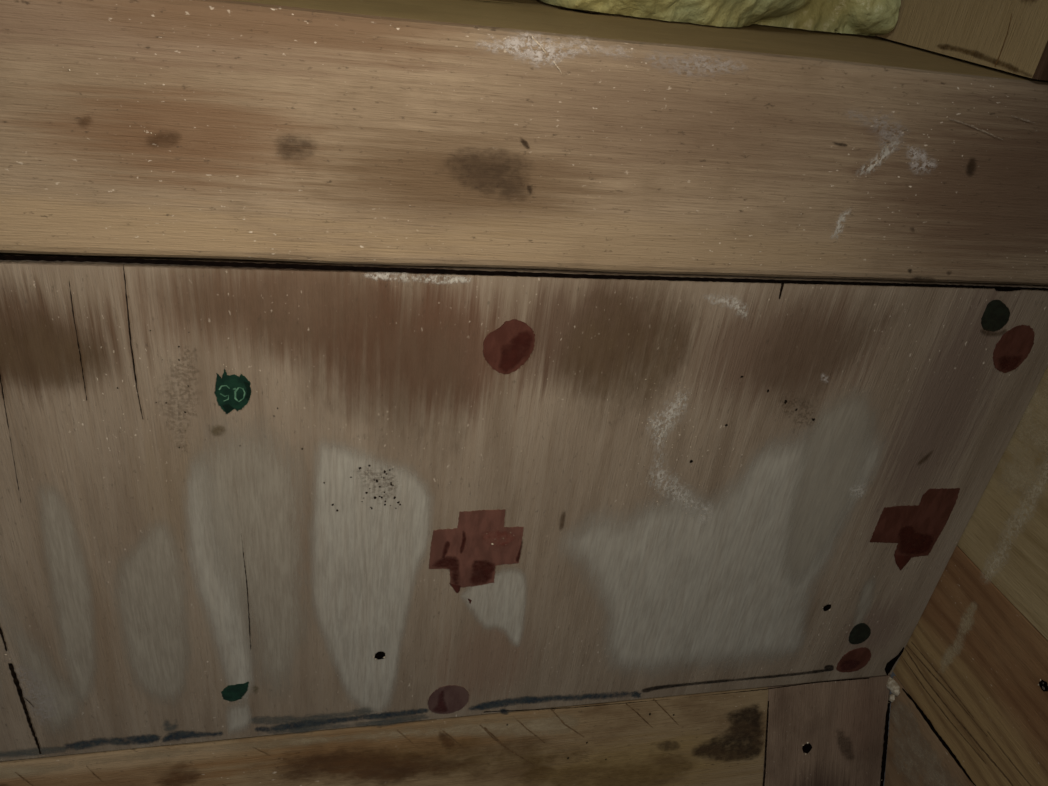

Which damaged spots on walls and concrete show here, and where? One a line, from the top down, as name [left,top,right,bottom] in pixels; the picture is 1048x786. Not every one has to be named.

crack [0,627,44,756]
leakage [695,706,763,761]
leakage [294,753,421,780]